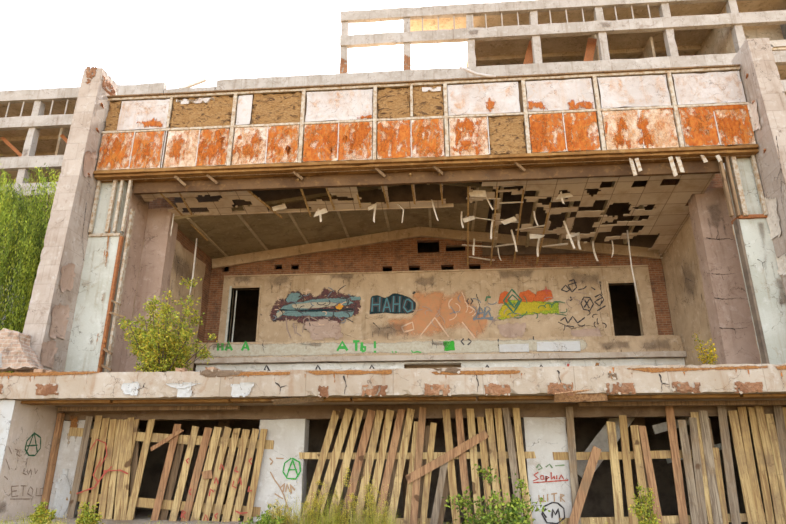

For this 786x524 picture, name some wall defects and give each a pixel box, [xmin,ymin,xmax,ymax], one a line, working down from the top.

spalling [85,66,116,96]
corrosion [98,98,495,171]
flaking render [765,197,781,239]
flaking render [60,262,76,292]
flaking render [40,304,71,368]
spalling [35,383,59,396]
spalling [424,383,452,396]
spalling [484,383,511,396]
spalling [546,382,573,396]
spalling [604,373,636,395]
spalling [734,381,763,394]